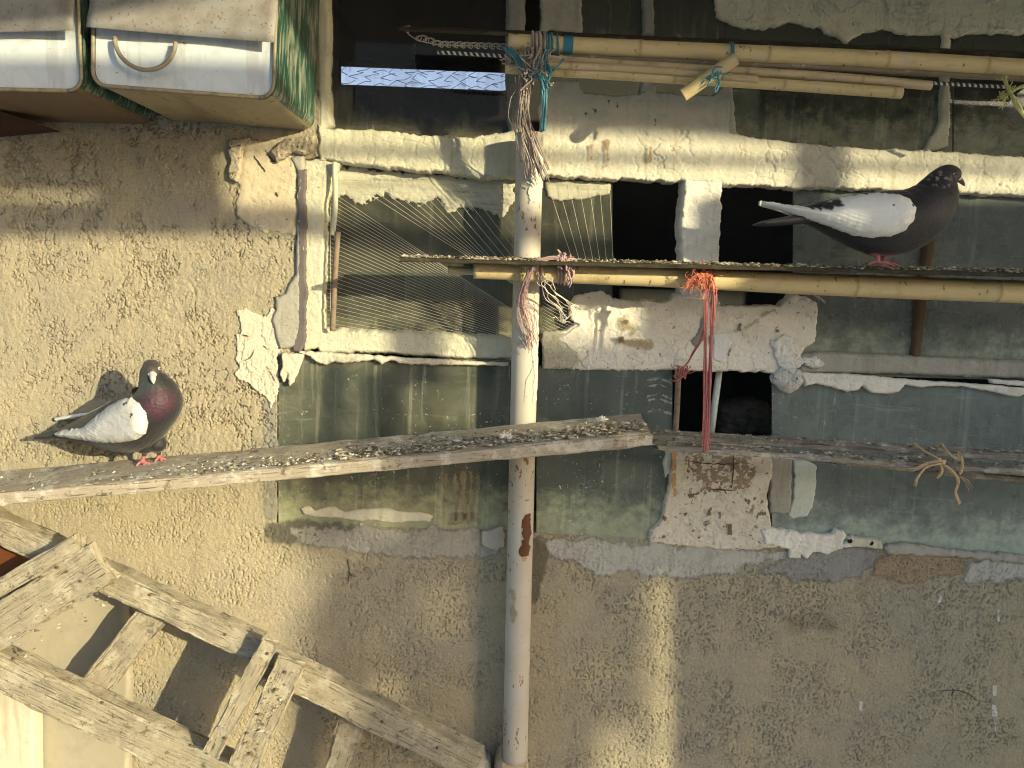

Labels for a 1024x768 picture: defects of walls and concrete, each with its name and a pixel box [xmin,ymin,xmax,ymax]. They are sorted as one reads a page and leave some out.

peeling [235,308,508,408]
spalling [531,293,596,403]
rust [519,513,532,562]
spalling [874,554,966,584]